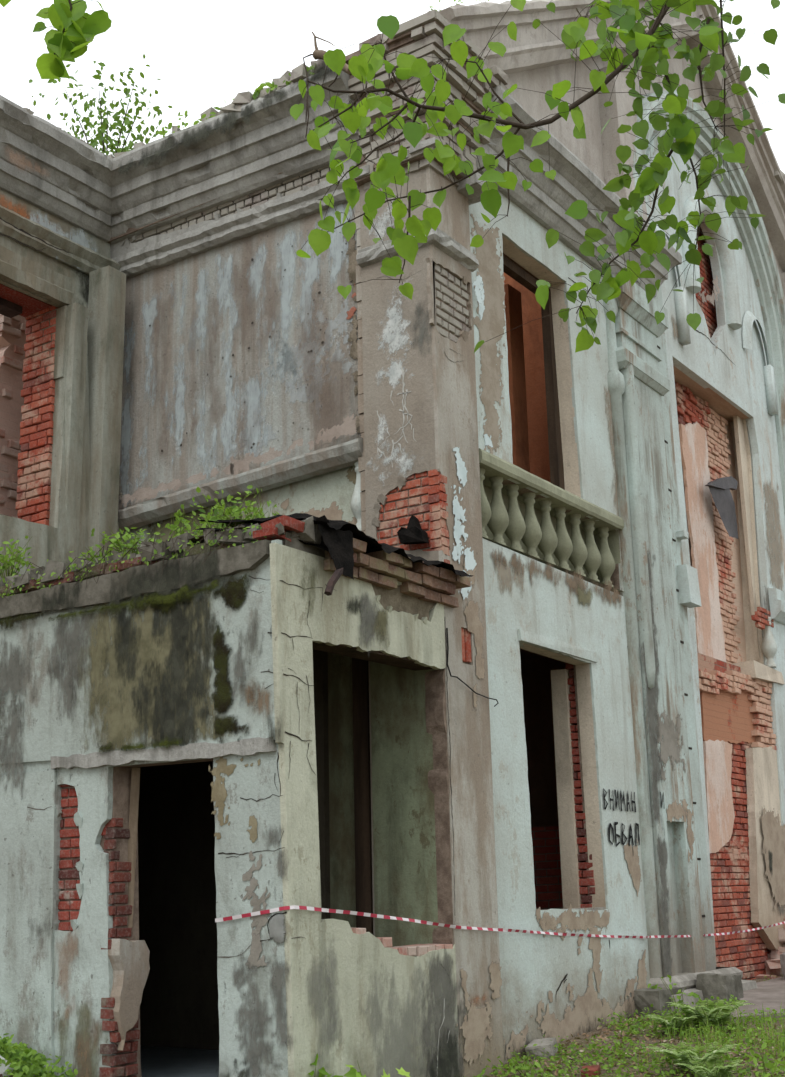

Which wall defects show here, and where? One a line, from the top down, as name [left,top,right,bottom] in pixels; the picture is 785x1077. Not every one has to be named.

leakage [119,63,332,173]
spalling [345,9,511,454]
leakage [119,299,185,508]
leakage [171,204,352,477]
spalling [675,382,711,446]
leakage [0,642,34,792]
leakage [42,549,230,750]
spalling [371,447,485,708]
spalling [698,670,777,750]
spalling [55,784,84,931]
crack [218,831,285,858]
peeling [456,904,647,1067]